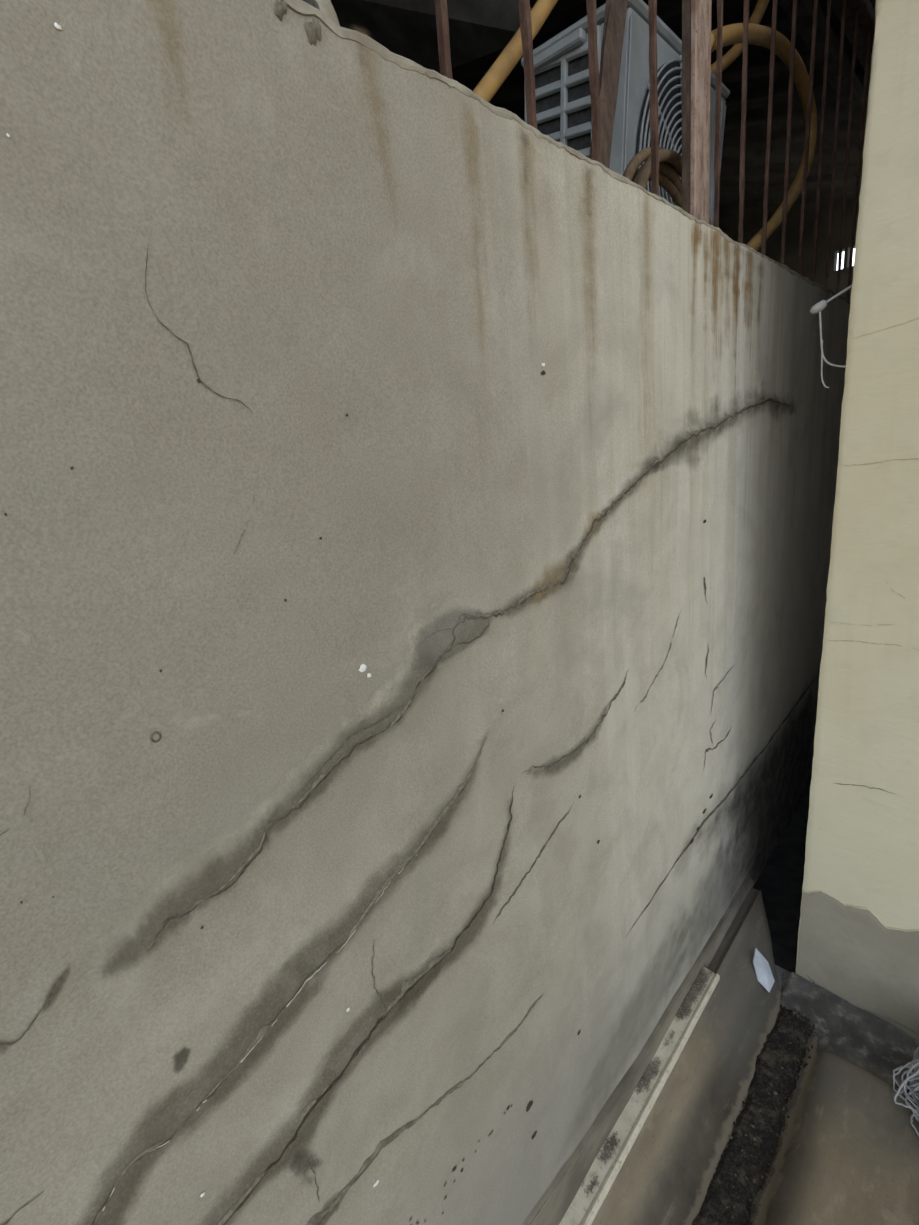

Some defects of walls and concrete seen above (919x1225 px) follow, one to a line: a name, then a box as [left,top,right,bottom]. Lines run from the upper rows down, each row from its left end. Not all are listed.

crack [145,250,253,413]
rust [694,225,761,317]
crack [145,396,812,952]
damp [109,624,434,971]
damp [716,691,814,875]
crack [0,973,64,1046]
damp [44,969,68,1008]
damp [85,864,397,1225]
damp [206,843,506,1225]
crack [92,577,707,1225]
damp [675,967,712,1020]
damp [581,1133,620,1194]